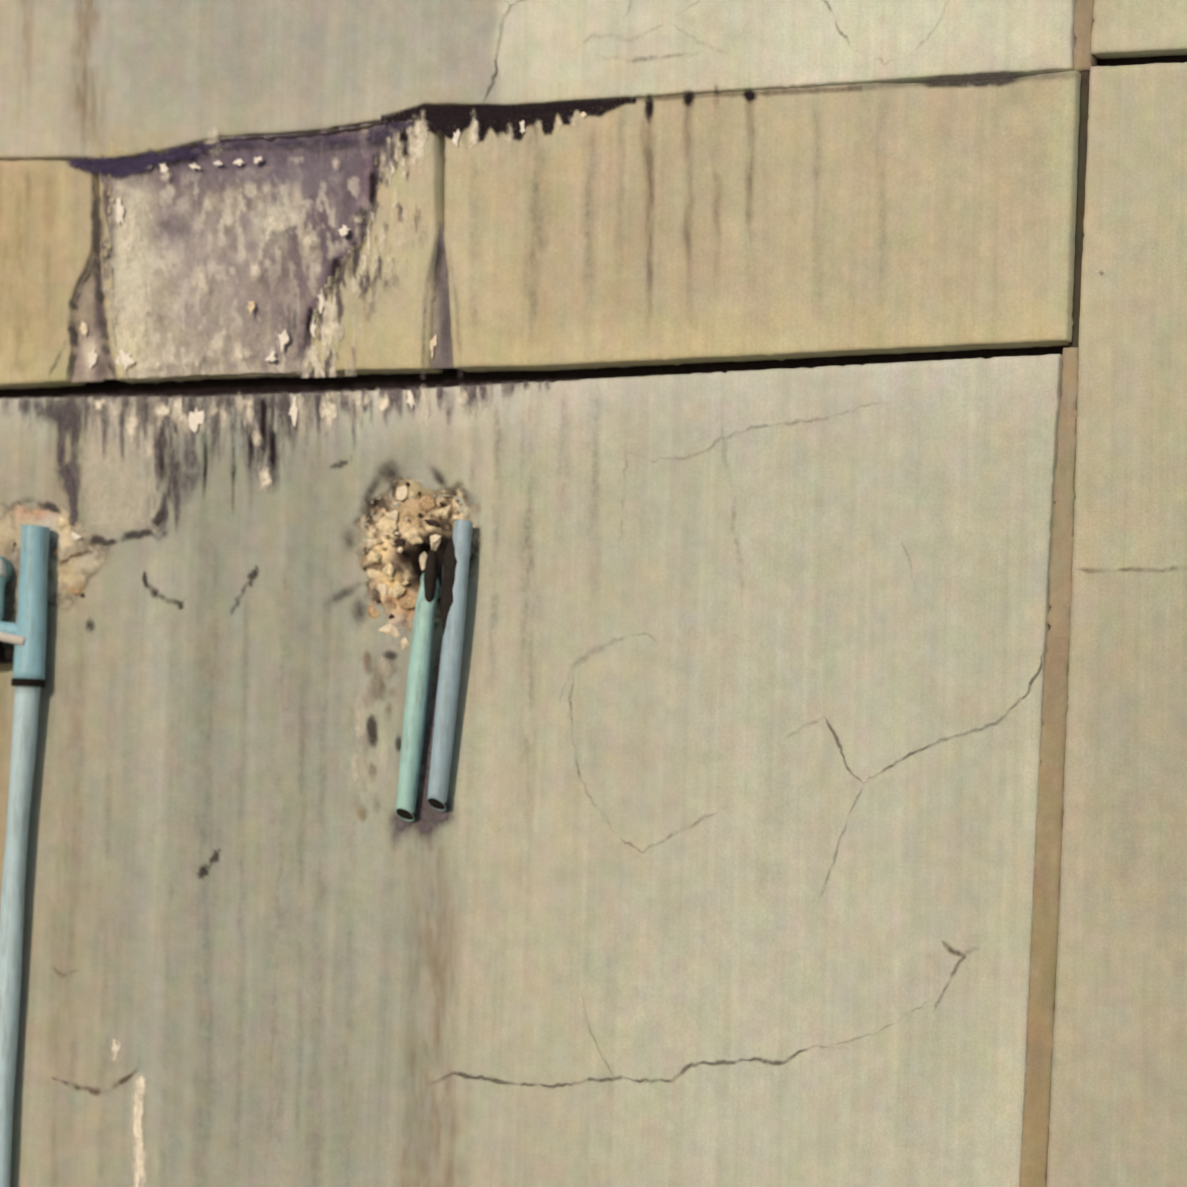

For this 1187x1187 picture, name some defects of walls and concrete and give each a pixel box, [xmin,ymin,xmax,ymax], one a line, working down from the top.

leakage [645,96,660,117]
leakage [744,90,769,101]
leakage [923,71,1018,87]
spalling [68,97,636,382]
peeling [0,381,528,621]
spalling [348,465,480,658]
crack [1012,659,1042,708]
peeling [367,716,376,745]
crack [826,720,850,771]
crack [447,1050,803,1088]